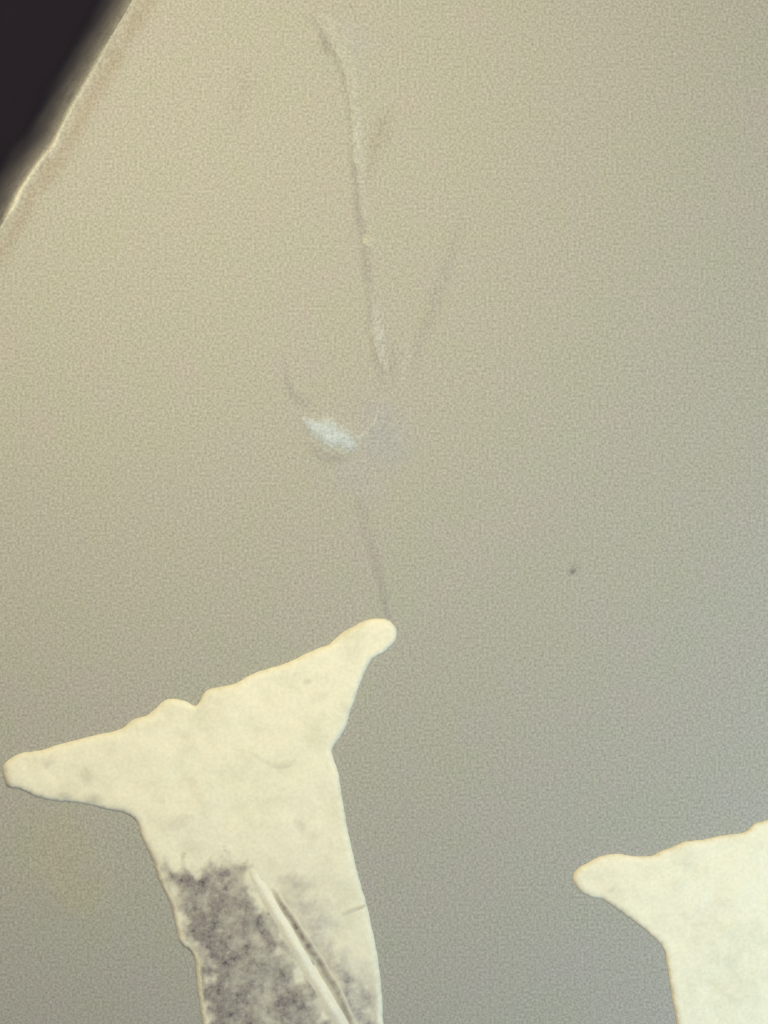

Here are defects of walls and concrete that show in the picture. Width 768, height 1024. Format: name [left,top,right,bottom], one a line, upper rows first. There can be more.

crack [351,499,395,624]